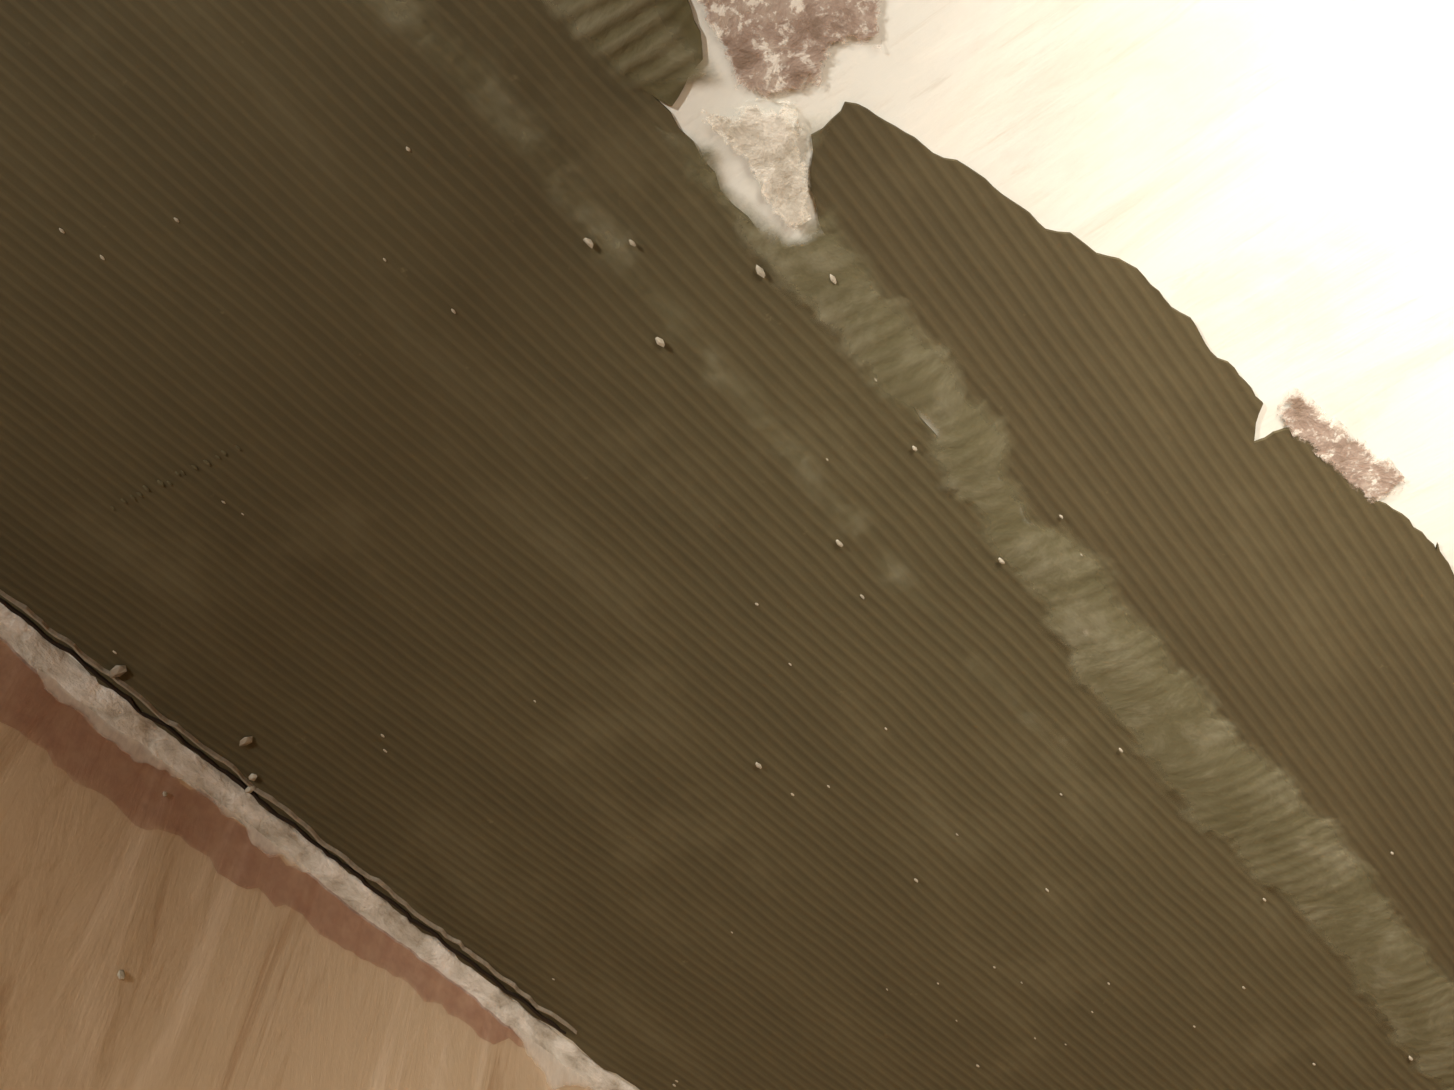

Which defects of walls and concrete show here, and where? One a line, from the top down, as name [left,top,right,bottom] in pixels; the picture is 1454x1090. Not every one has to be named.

spalling [638,81,687,106]
spalling [509,128,538,143]
spalling [592,228,627,260]
spalling [656,0,1454,985]
peeling [44,675,181,775]
spalling [84,662,189,749]
peeling [229,809,306,869]